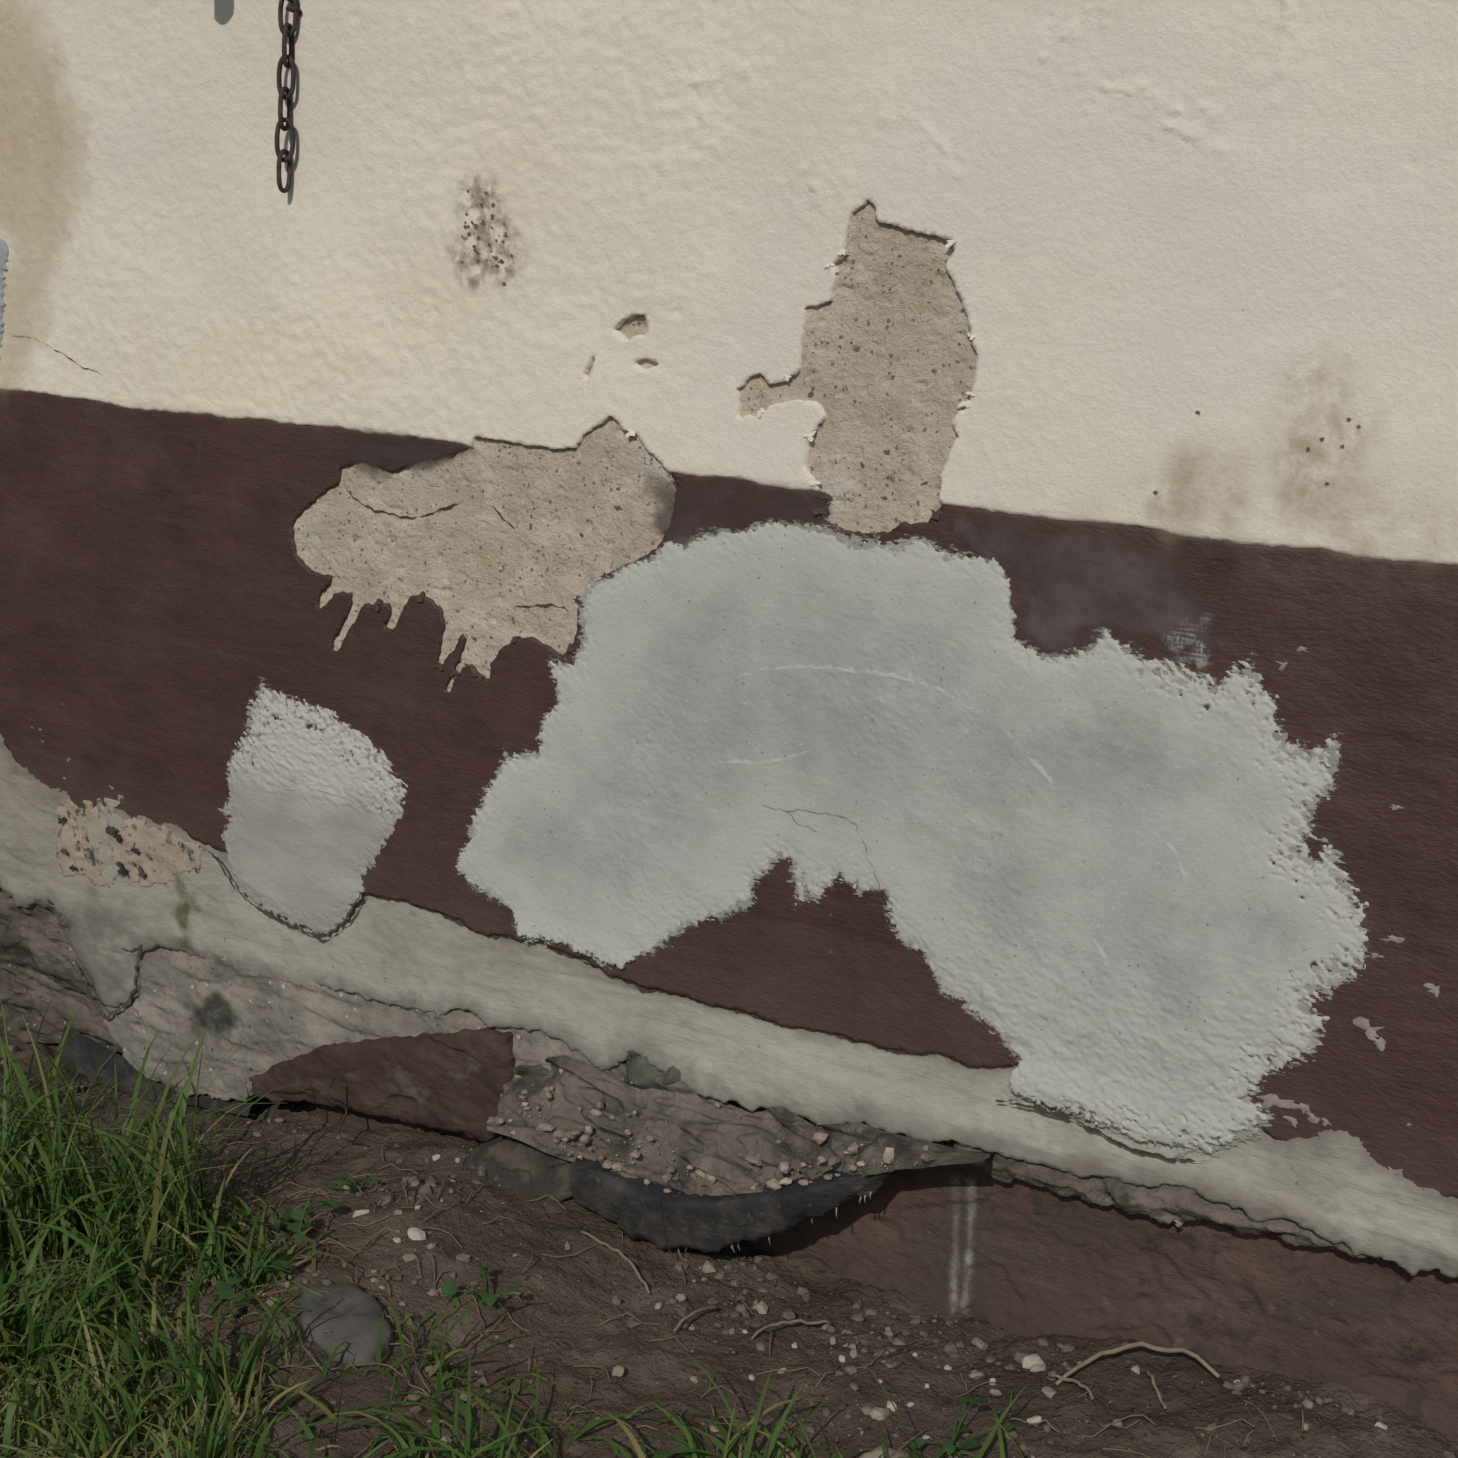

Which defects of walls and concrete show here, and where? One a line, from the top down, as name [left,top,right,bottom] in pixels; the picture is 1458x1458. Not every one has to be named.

water stain [459,181,513,285]
flaking render [618,315,648,340]
flaking render [639,359,659,369]
spalling [739,201,977,533]
spalling [293,416,680,692]
peeling [56,798,201,888]
spalling [0,888,1381,1260]